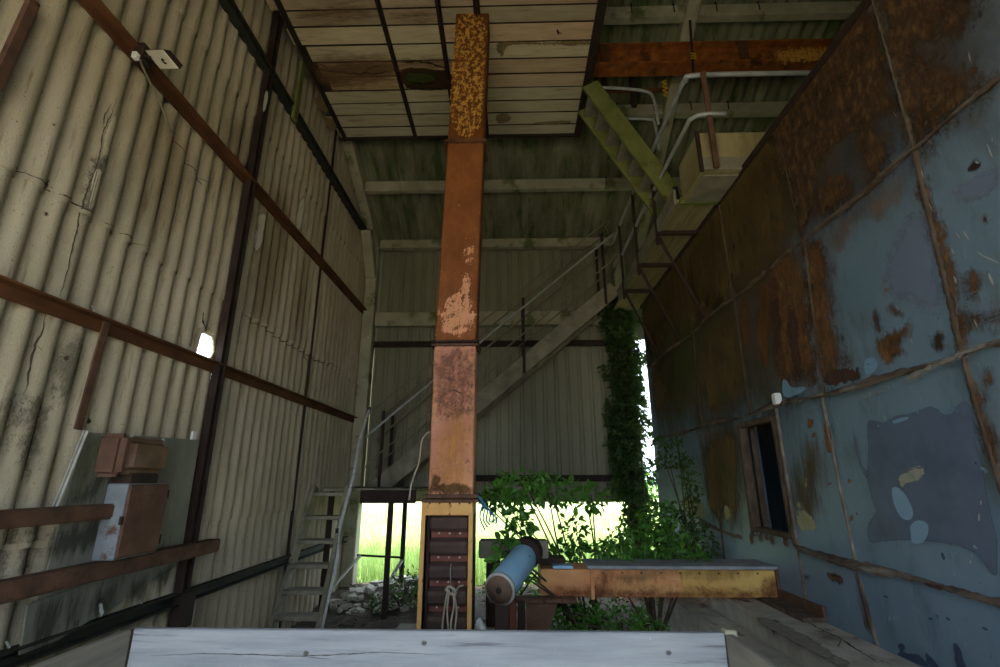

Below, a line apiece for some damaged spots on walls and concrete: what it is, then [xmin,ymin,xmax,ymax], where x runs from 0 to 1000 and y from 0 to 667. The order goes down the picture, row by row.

corrosion [871,0,991,158]
crack [60,101,116,294]
crack [23,314,46,394]
corrosion [434,349,475,419]
peeling [436,244,478,337]
corrosion [652,224,861,529]
corrosion [873,305,908,364]
corrosion [916,182,1000,351]
corrosion [428,475,470,494]